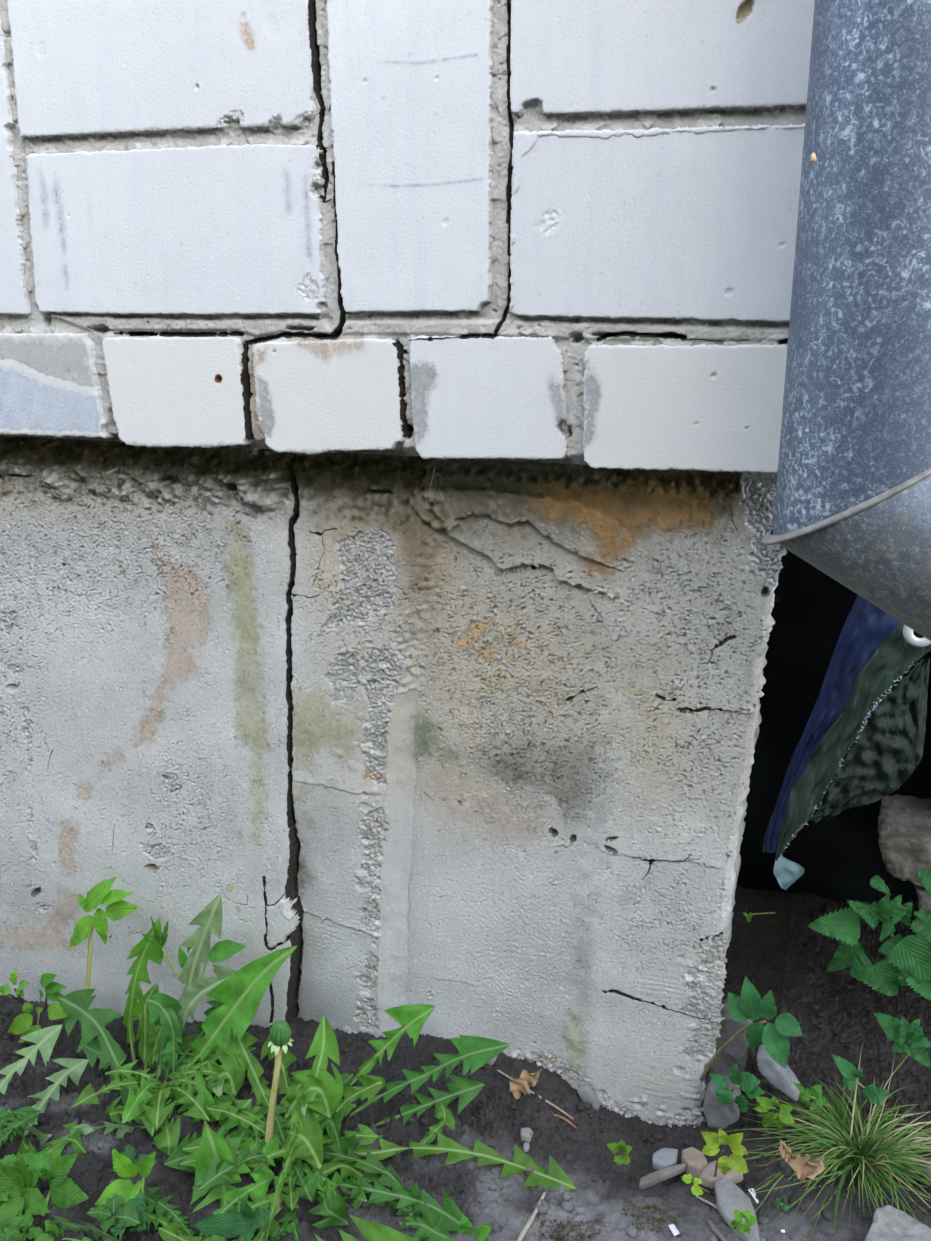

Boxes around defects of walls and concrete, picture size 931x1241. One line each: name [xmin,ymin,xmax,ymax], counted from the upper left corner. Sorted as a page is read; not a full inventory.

crack [114,0,347,440]
crack [392,0,514,438]
spalling [320,527,399,631]
corrosion [526,477,714,575]
crack [221,454,338,1023]
spalling [324,645,406,788]
spalling [356,806,391,932]
crack [634,854,692,880]
spalling [353,951,380,1033]
crack [604,989,711,1022]